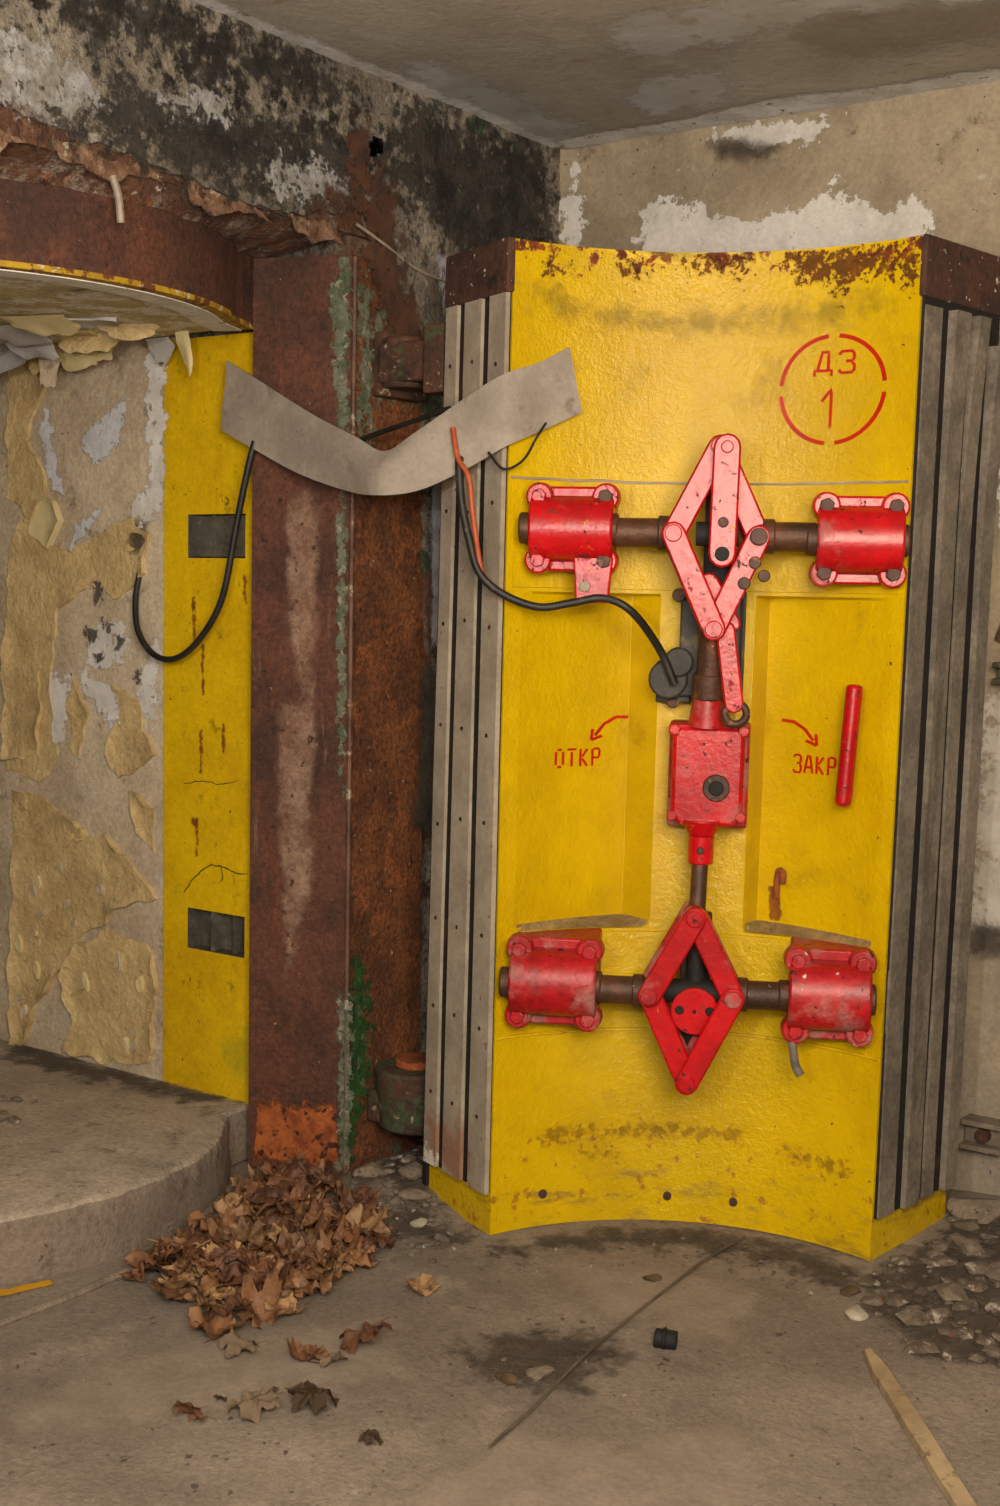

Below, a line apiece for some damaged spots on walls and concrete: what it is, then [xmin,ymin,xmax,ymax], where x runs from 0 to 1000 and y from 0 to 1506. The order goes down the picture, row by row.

flaking render [0,129,26,152]
flaking render [55,140,163,223]
flaking render [187,181,270,222]
leakage [0,0,1000,322]
peeling [630,174,936,252]
corrosion [542,249,575,291]
corrosion [615,258,648,292]
corrosion [675,241,920,309]
leakage [431,482,441,648]
peeling [0,314,193,1065]
peeling [970,691,1000,943]
corrosion [254,1099,340,1166]